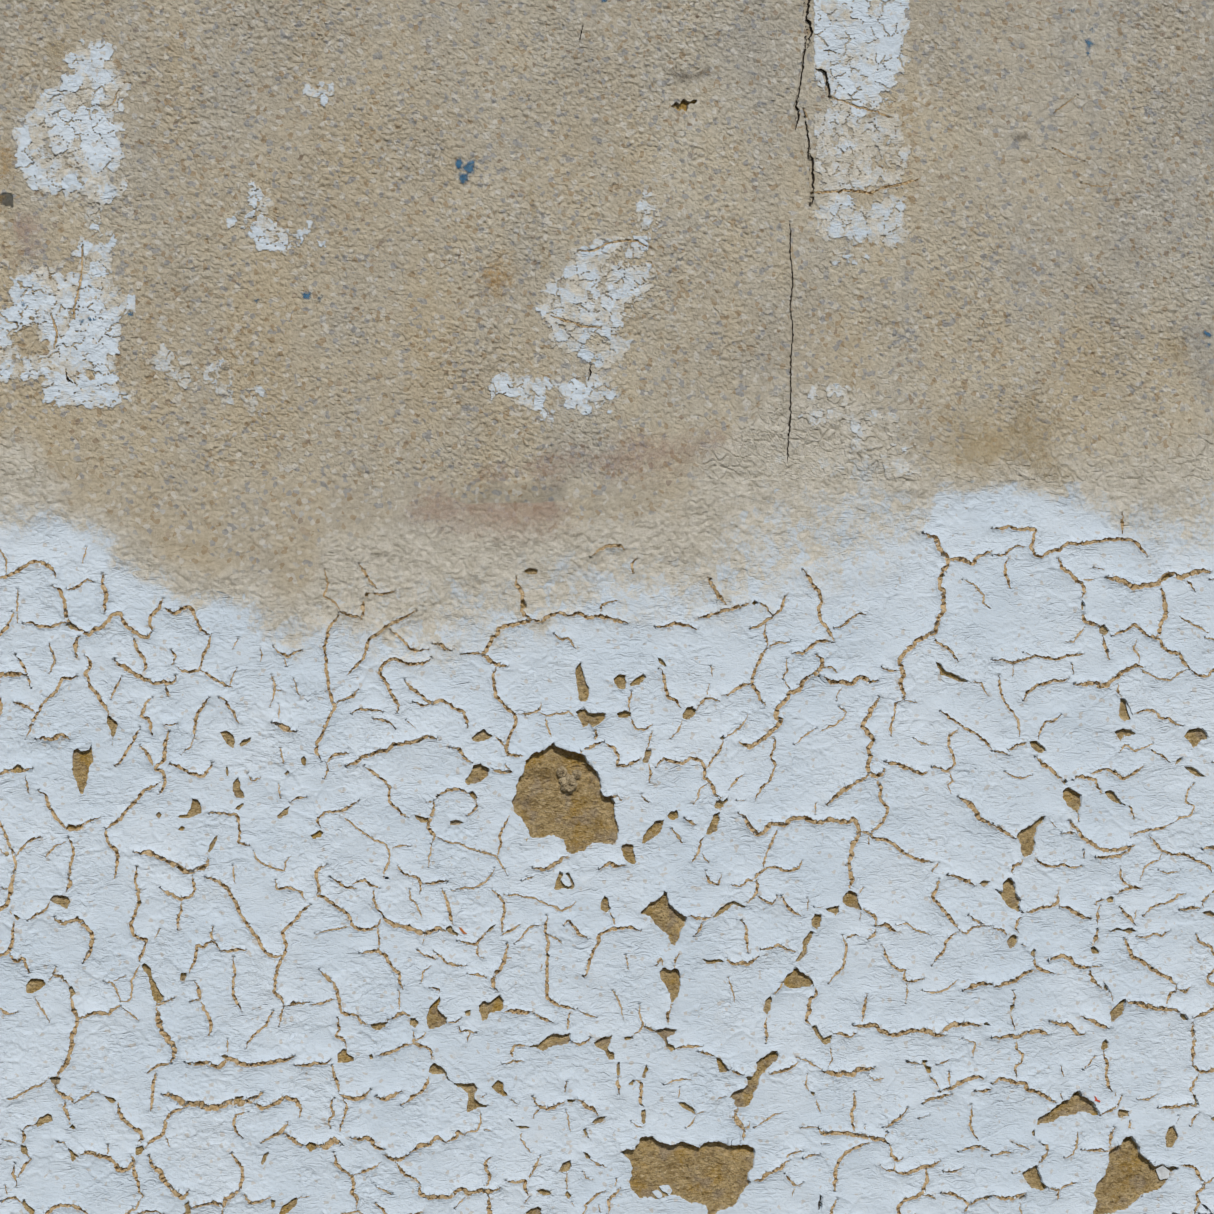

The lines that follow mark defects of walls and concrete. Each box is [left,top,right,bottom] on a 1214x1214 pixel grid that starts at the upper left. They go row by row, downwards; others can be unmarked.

flaking render [0,0,1214,482]
crack [785,0,921,464]
crack [0,513,1214,1214]
peeling [652,1185,672,1199]
peeling [1156,1162,1171,1180]